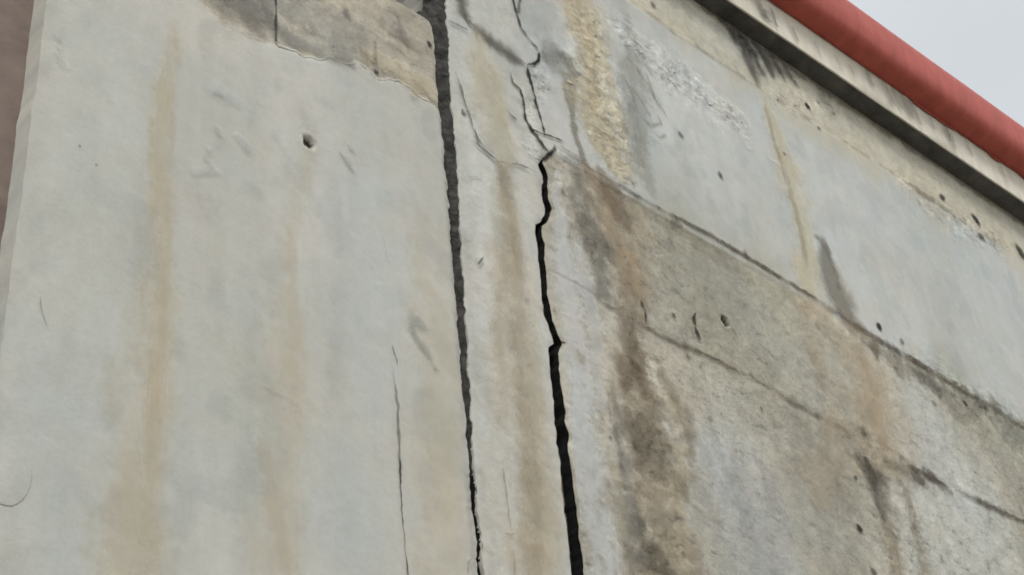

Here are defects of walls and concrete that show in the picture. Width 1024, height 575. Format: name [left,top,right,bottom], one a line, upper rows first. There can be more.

peeling [564,0,628,176]
water stain [726,24,796,83]
crack [450,0,593,575]
crack [399,457,409,575]